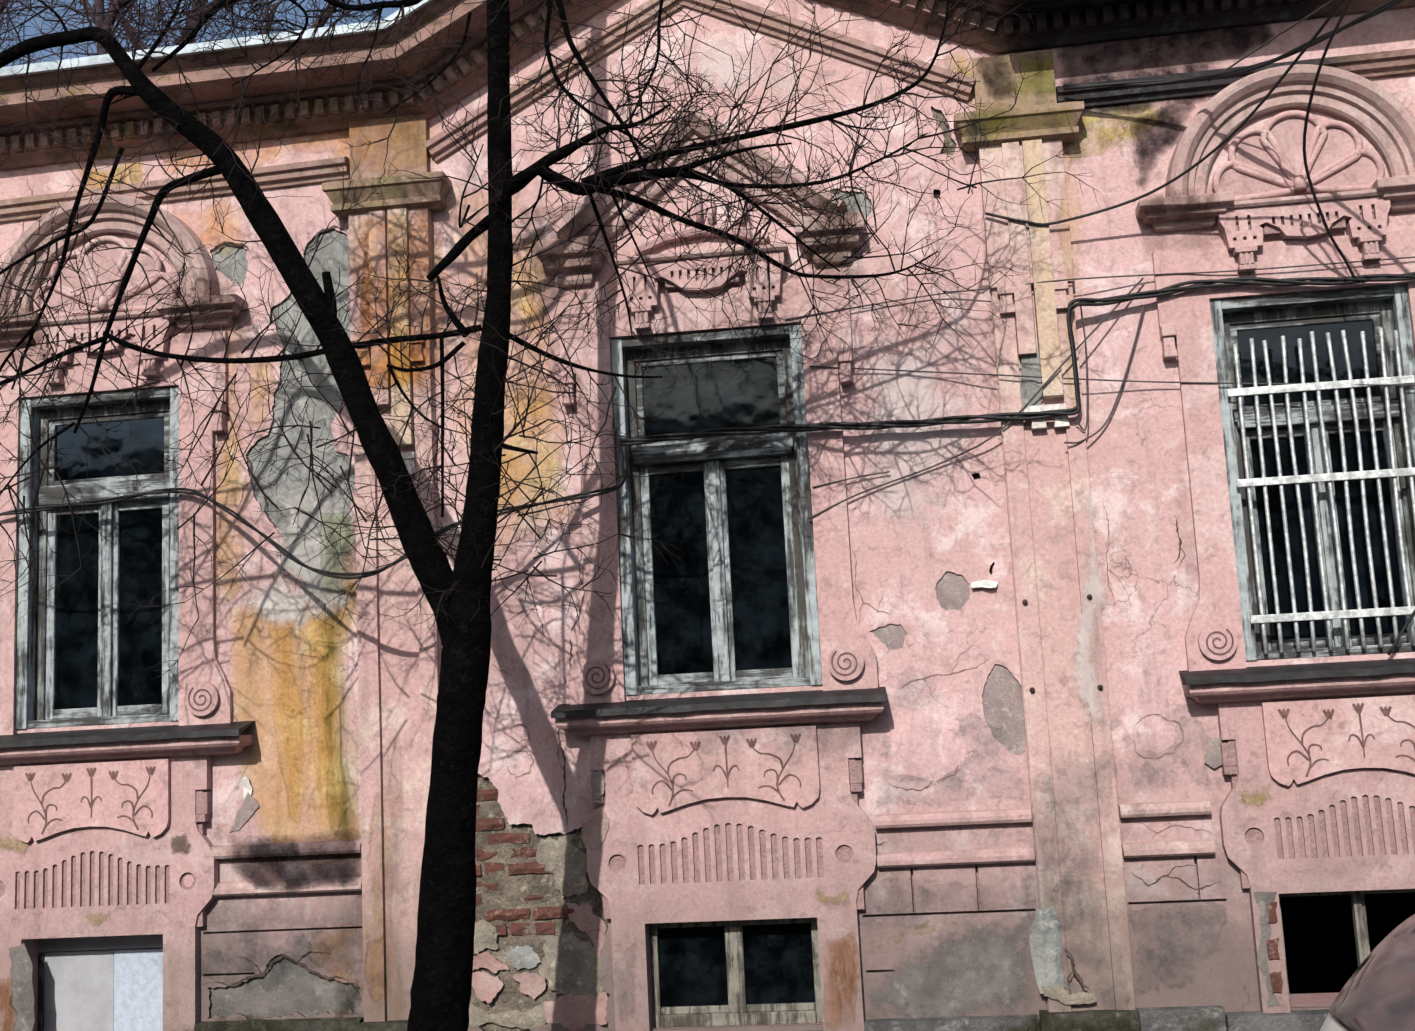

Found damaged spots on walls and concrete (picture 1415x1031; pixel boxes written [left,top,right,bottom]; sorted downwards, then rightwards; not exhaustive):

flaking render [304,228,350,339]
flaking render [247,293,355,534]
leakage [250,490,355,622]
flaking render [935,562,998,611]
crack [1103,505,1130,605]
crack [1174,517,1186,572]
crack [898,641,990,706]
flaking render [982,664,1026,755]
crack [506,724,567,825]
flaking render [468,769,610,1031]
crack [1132,865,1218,890]
flaking render [207,954,362,1019]